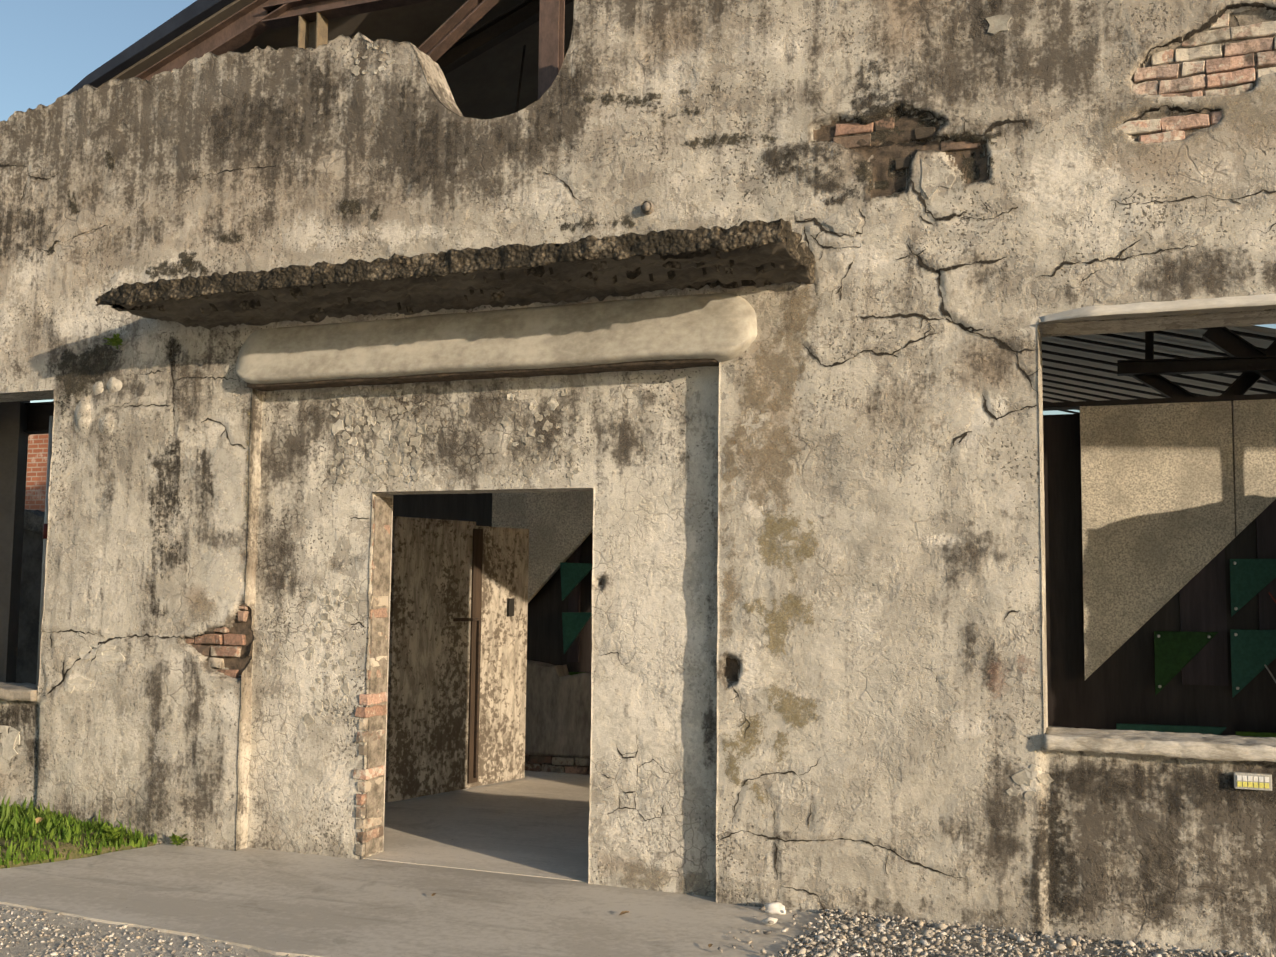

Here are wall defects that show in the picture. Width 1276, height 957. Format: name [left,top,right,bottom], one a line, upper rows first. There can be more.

damp [207,56,344,158]
damp [399,82,468,191]
spalling [813,108,989,199]
spalling [1117,8,1276,144]
damp [0,194,56,262]
crack [1038,189,1276,283]
crack [796,180,1039,453]
crack [41,625,225,696]
spalling [185,603,288,679]
spalling [304,496,392,856]
crack [720,757,966,916]
damp [1022,758,1276,931]